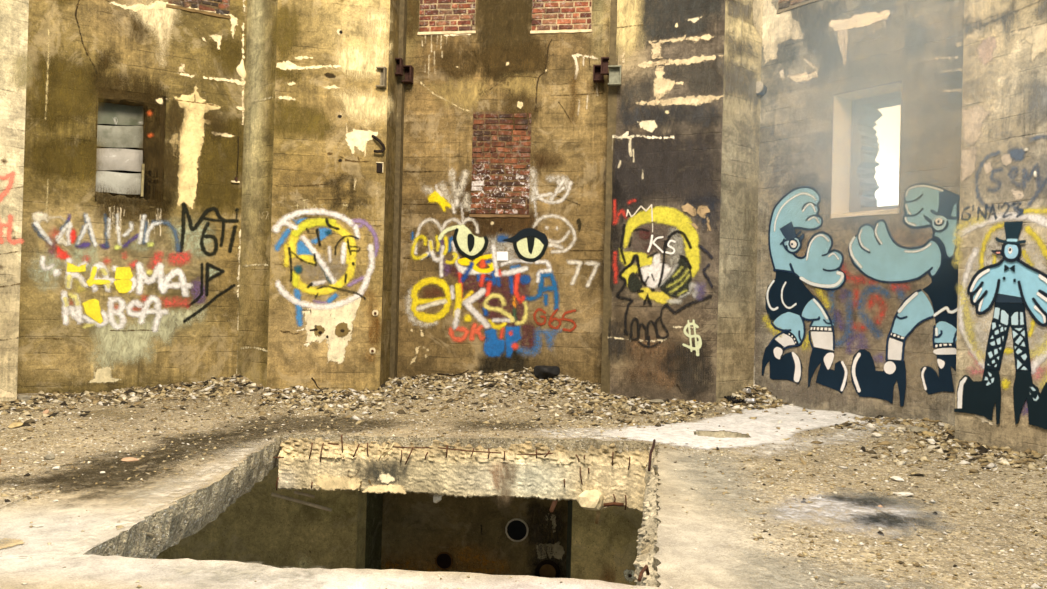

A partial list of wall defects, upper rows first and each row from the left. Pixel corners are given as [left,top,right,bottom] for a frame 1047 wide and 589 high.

crack [75,0,98,137]
peeling [109,0,238,50]
peeling [616,0,643,63]
peeling [636,0,818,114]
peeling [829,10,891,66]
peeling [156,63,245,209]
peeling [612,120,674,168]
peeling [297,297,361,364]
spalling [309,435,369,462]
spalling [311,470,406,494]
spalling [383,443,553,465]
spalling [603,494,627,510]